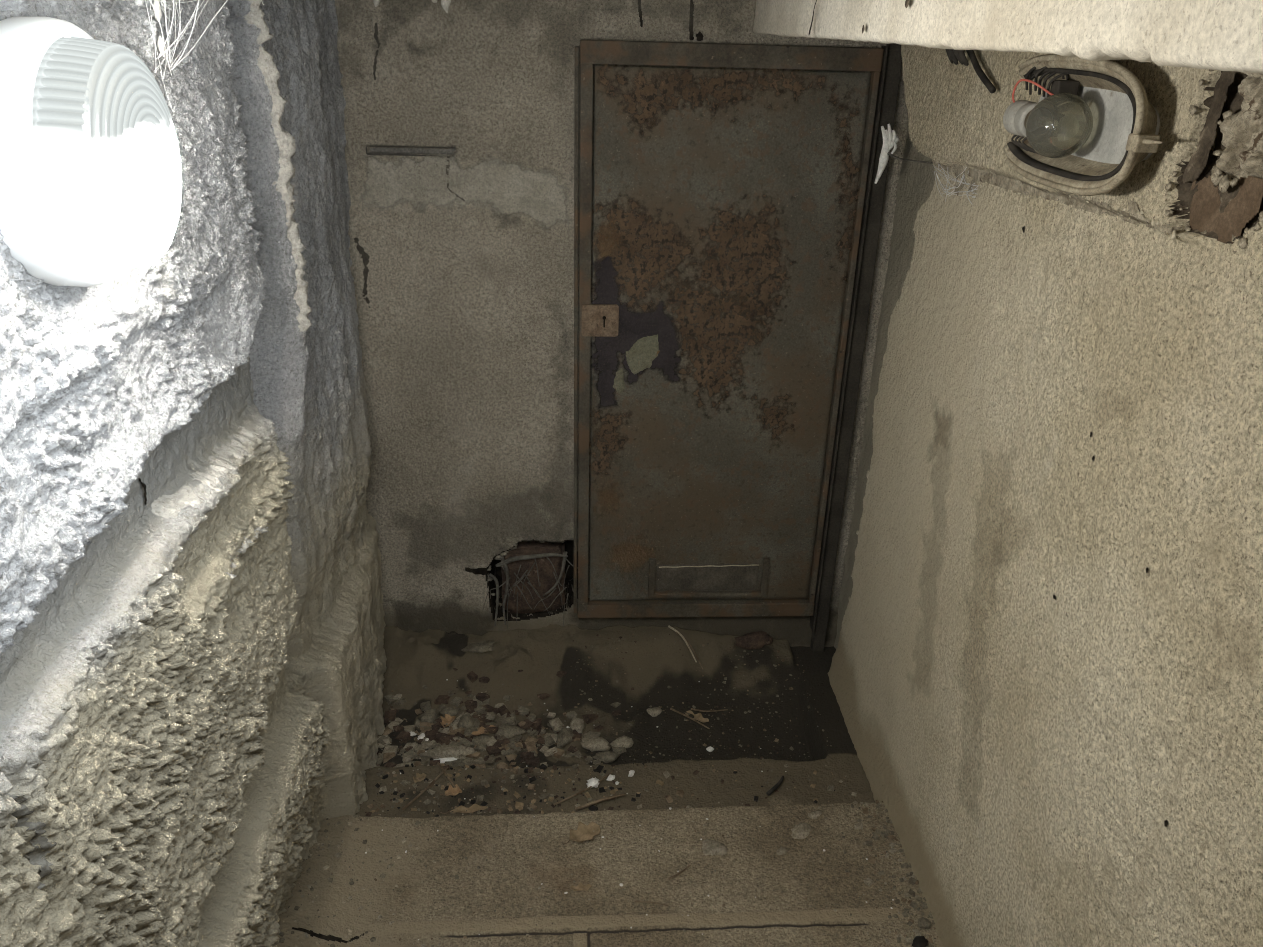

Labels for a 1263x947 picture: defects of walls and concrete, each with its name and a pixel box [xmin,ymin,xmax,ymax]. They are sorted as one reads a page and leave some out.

corrosion [597,64,860,282]
spalling [933,69,1263,249]
corrosion [740,391,796,447]
spalling [485,538,578,621]